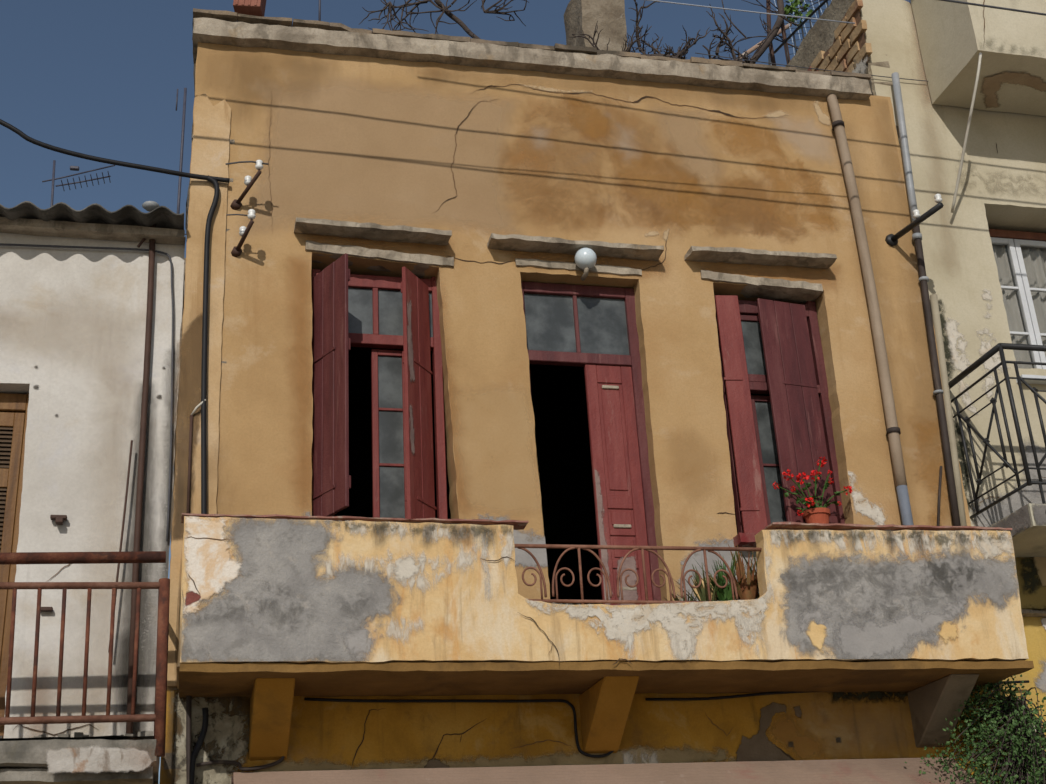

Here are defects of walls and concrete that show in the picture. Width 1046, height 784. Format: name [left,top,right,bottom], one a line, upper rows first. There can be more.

peeling [980,72,1046,108]
leakage [509,101,709,222]
crack [431,84,788,214]
leakage [716,123,823,234]
peeling [945,318,978,414]
peeling [977,289,1003,397]
peeling [326,525,513,596]
peeling [527,469,1013,660]
peeling [1033,557,1046,586]
crack [350,708,385,770]
crack [430,718,487,760]
peeling [253,702,823,772]